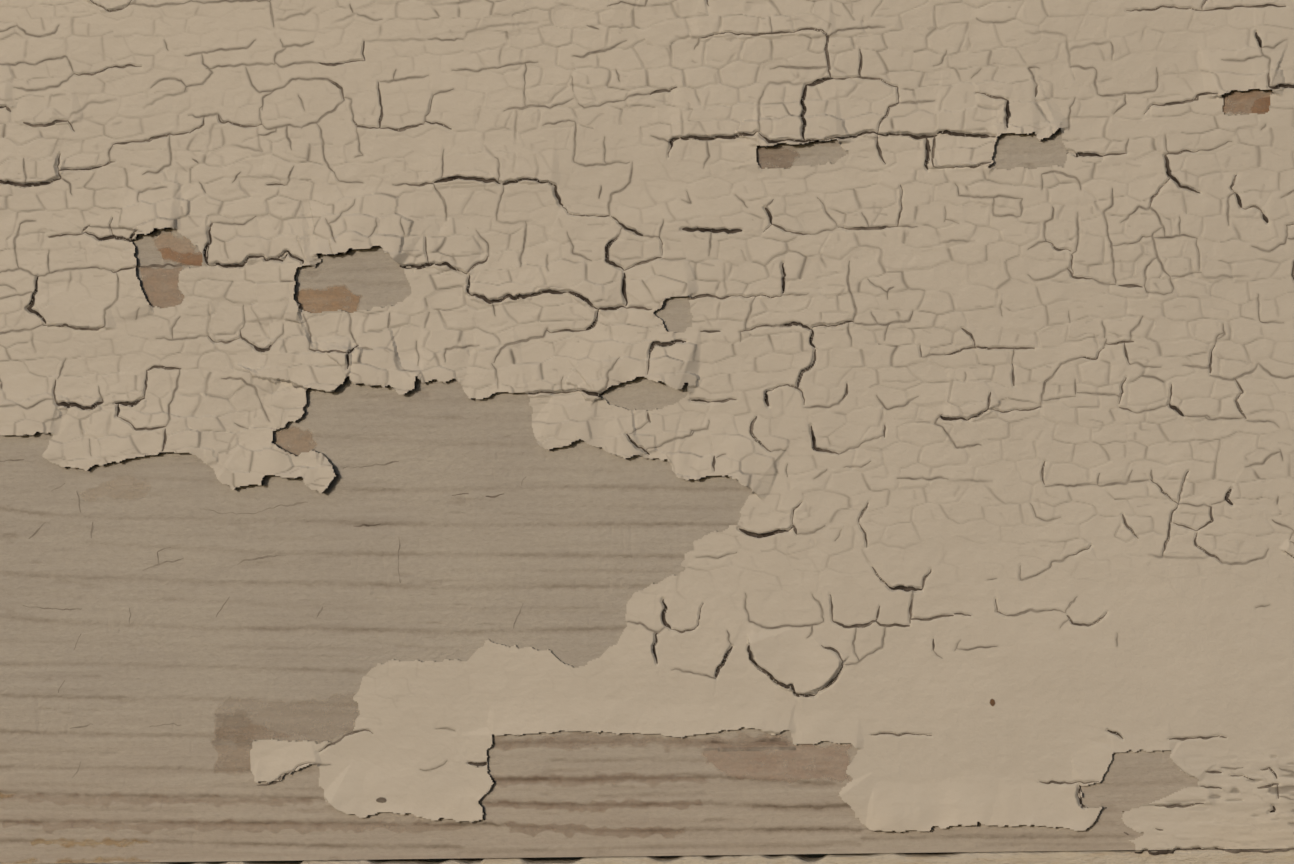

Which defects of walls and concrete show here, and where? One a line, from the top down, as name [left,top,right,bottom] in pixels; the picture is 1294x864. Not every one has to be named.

peeling [1222,89,1272,116]
peeling [756,139,849,169]
peeling [988,128,1076,170]
peeling [132,227,208,308]
peeling [294,246,412,313]
crack [0,0,1294,565]
crack [528,261,1118,697]
crack [145,547,183,570]
crack [354,524,401,583]
peeling [0,348,1199,864]